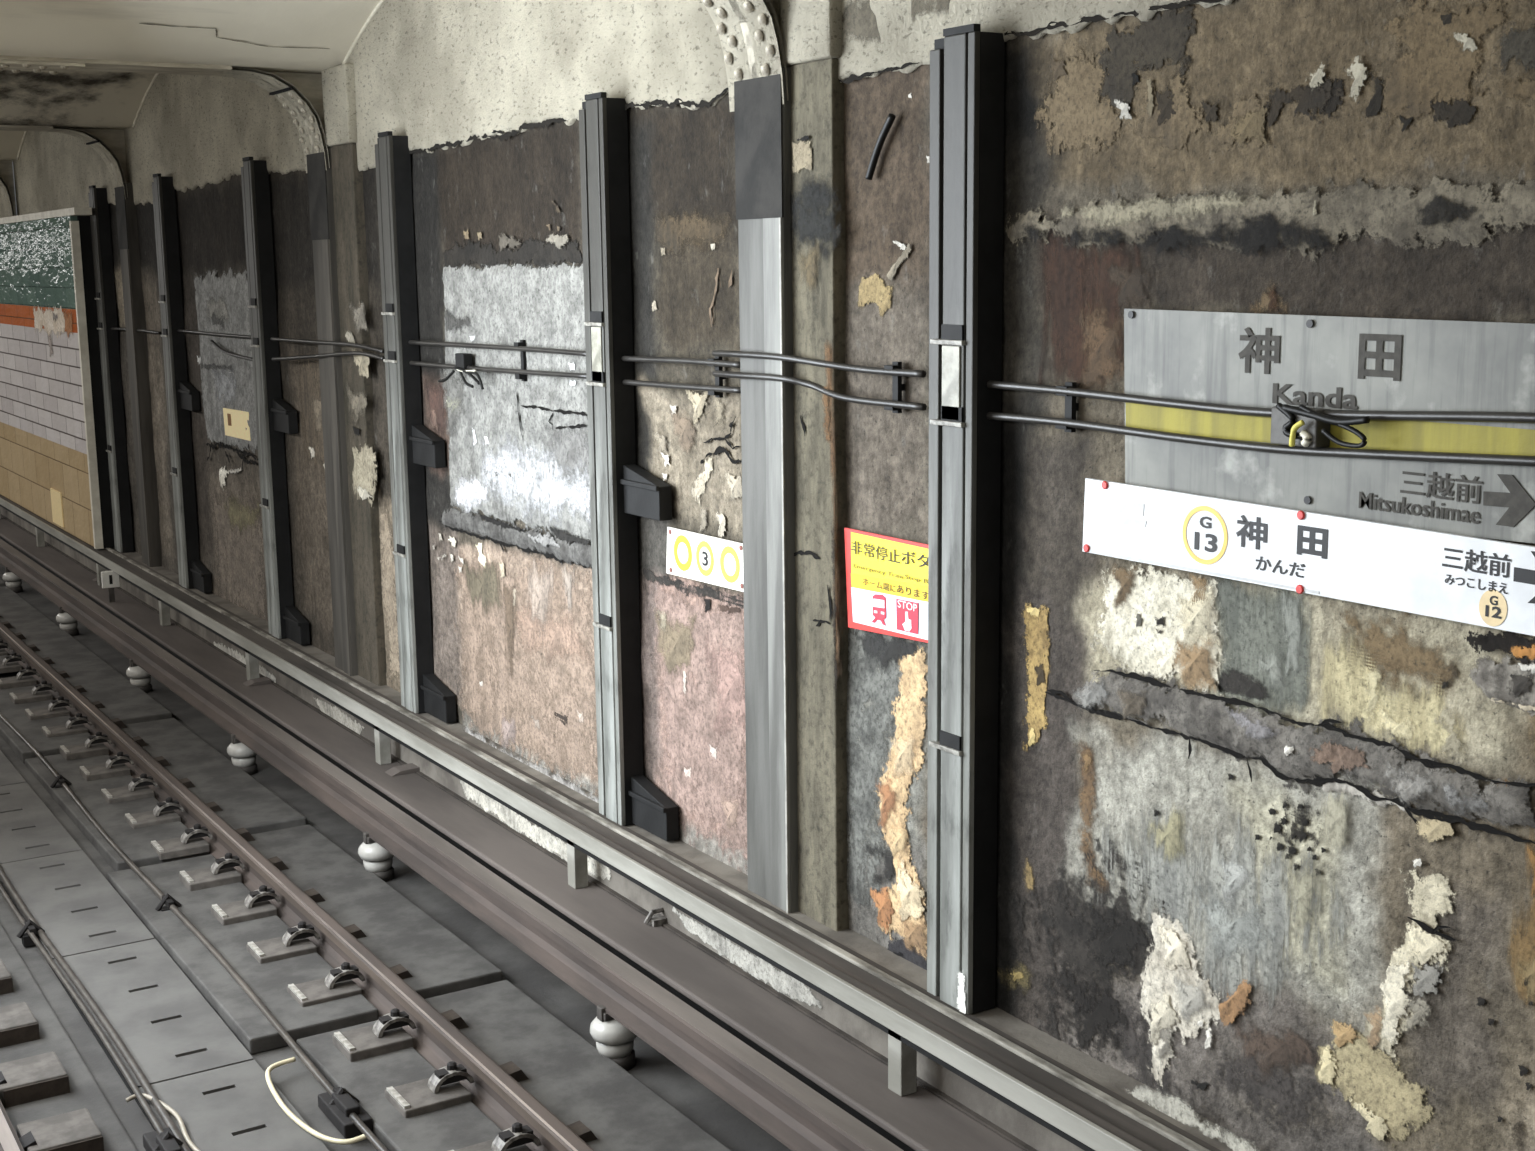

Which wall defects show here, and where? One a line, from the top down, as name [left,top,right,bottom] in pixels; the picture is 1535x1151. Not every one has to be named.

water stain [842,0,881,45]
water stain [911,0,950,21]
peeling [1309,62,1325,88]
peeling [1347,0,1535,129]
peeling [792,136,812,174]
peeling [345,303,400,683]
peeling [1090,564,1226,697]
peeling [870,646,928,960]
crack [1045,669,1535,844]
peeling [1322,778,1454,850]
peeling [1140,907,1252,1088]
peeling [1314,859,1457,1146]